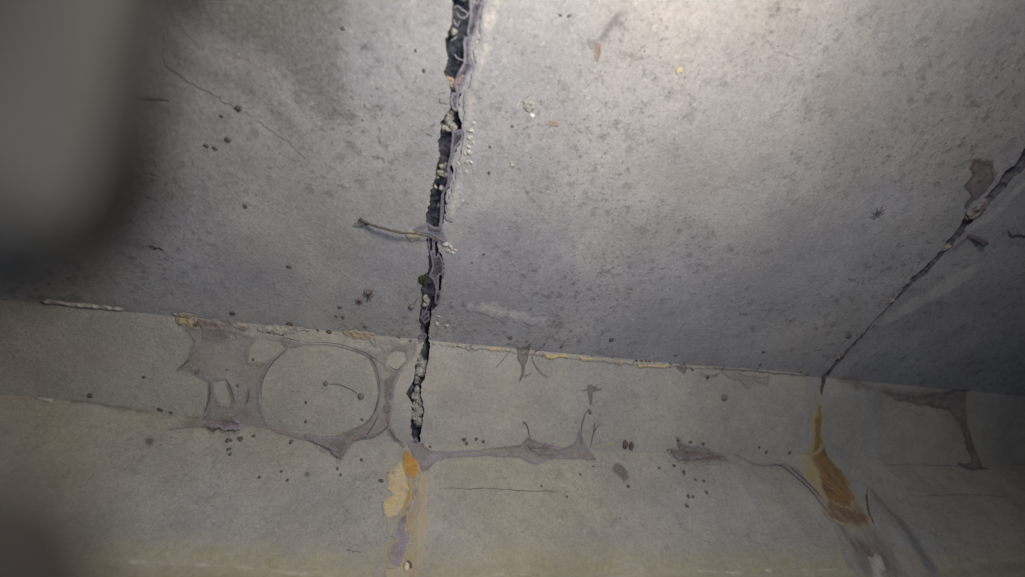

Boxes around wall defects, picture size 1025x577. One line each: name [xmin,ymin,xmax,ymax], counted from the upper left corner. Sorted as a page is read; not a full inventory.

crack [407,0,481,444]
crack [885,146,1025,305]
damp [172,312,310,343]
efflorescence [463,299,565,327]
rust [369,451,430,577]
rust [798,390,926,577]